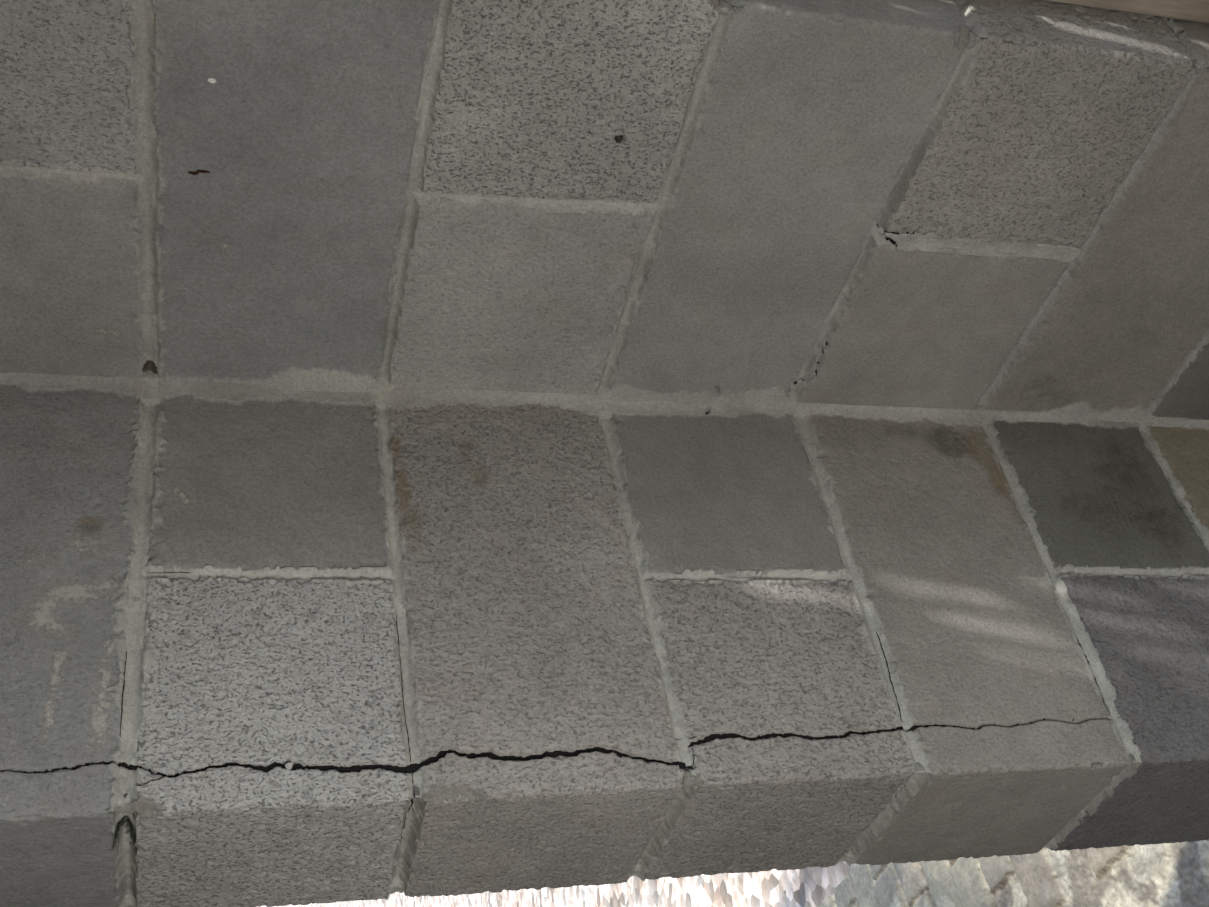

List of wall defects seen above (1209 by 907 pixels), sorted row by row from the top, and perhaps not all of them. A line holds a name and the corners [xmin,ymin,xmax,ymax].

crack [24,615,1110,843]